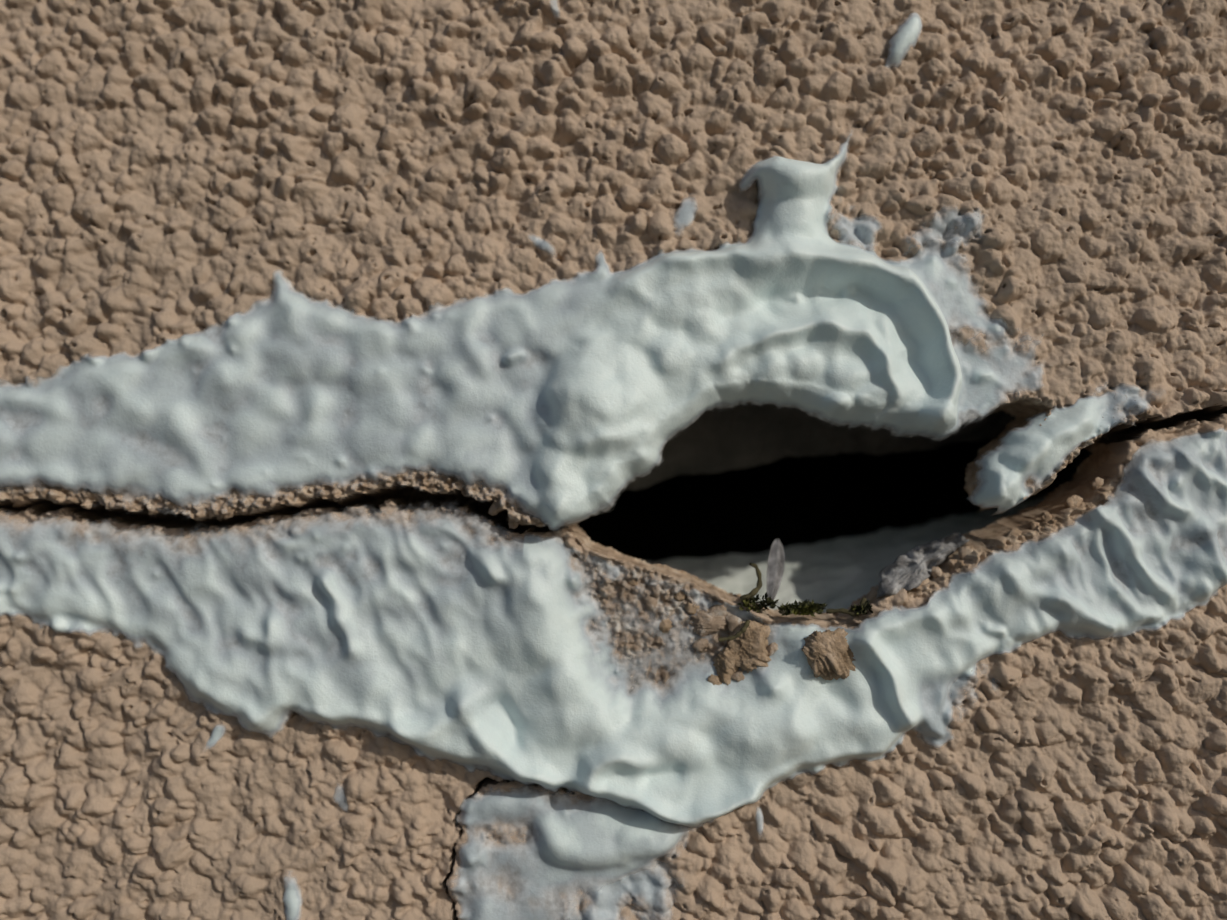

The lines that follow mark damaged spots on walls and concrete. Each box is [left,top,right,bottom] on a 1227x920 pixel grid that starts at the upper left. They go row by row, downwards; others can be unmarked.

crack [0,470,565,534]
spalling [571,438,995,694]
spalling [876,448,1122,600]
crack [1023,404,1227,500]
crack [441,777,575,920]